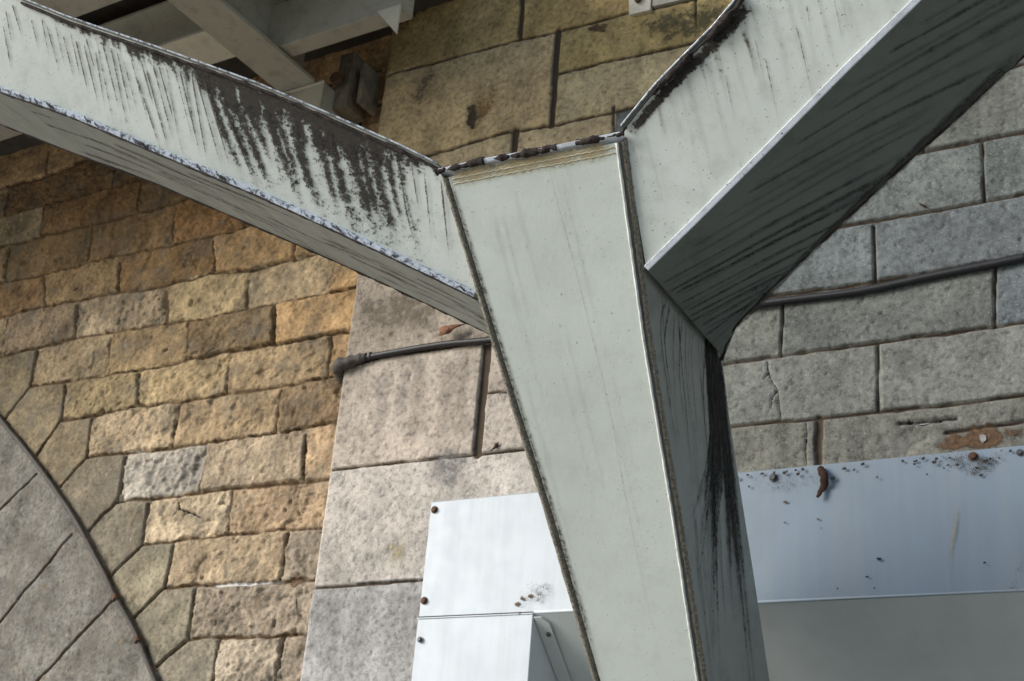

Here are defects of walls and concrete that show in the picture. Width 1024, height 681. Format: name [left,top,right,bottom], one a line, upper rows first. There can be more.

water stain [31,20,486,334]
water stain [661,172,875,647]
crack [766,361,781,416]
corrosion [937,422,1021,450]